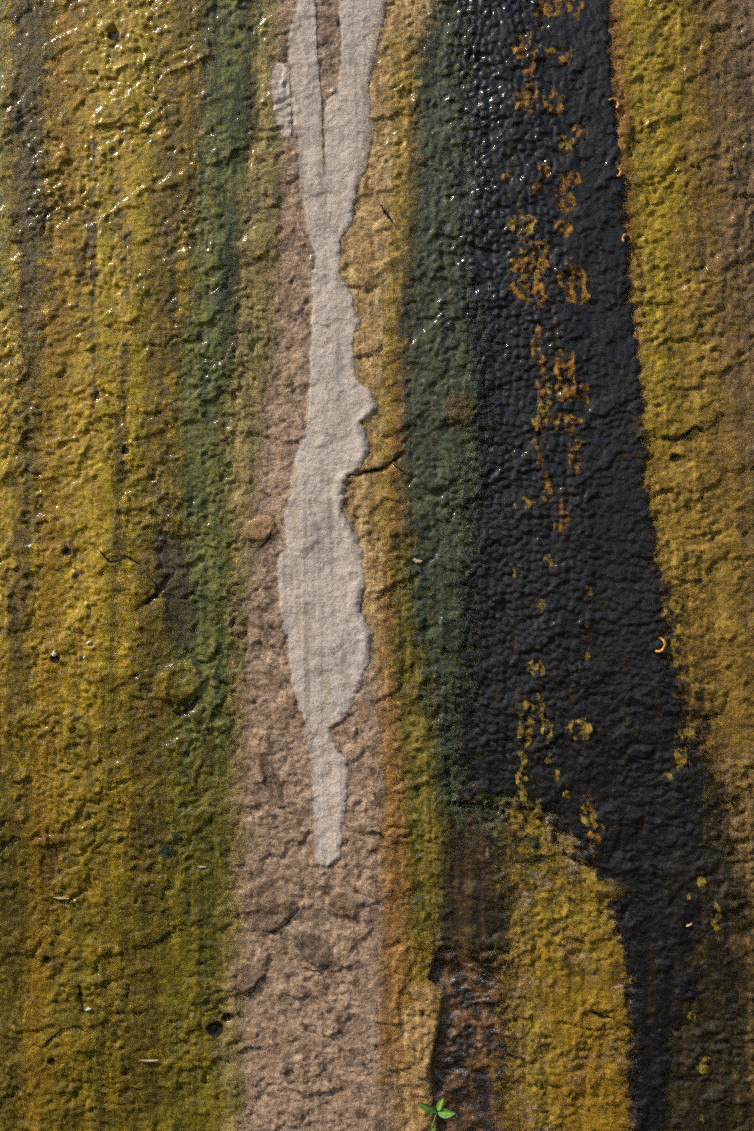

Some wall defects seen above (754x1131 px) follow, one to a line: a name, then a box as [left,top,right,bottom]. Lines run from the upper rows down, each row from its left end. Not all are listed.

crack [0,836,22,863]
leakage [6,0,52,788]
crack [97,548,175,612]
leakage [122,63,194,1131]
leakage [224,0,403,1131]
crack [348,453,406,476]
leakage [437,0,754,1131]